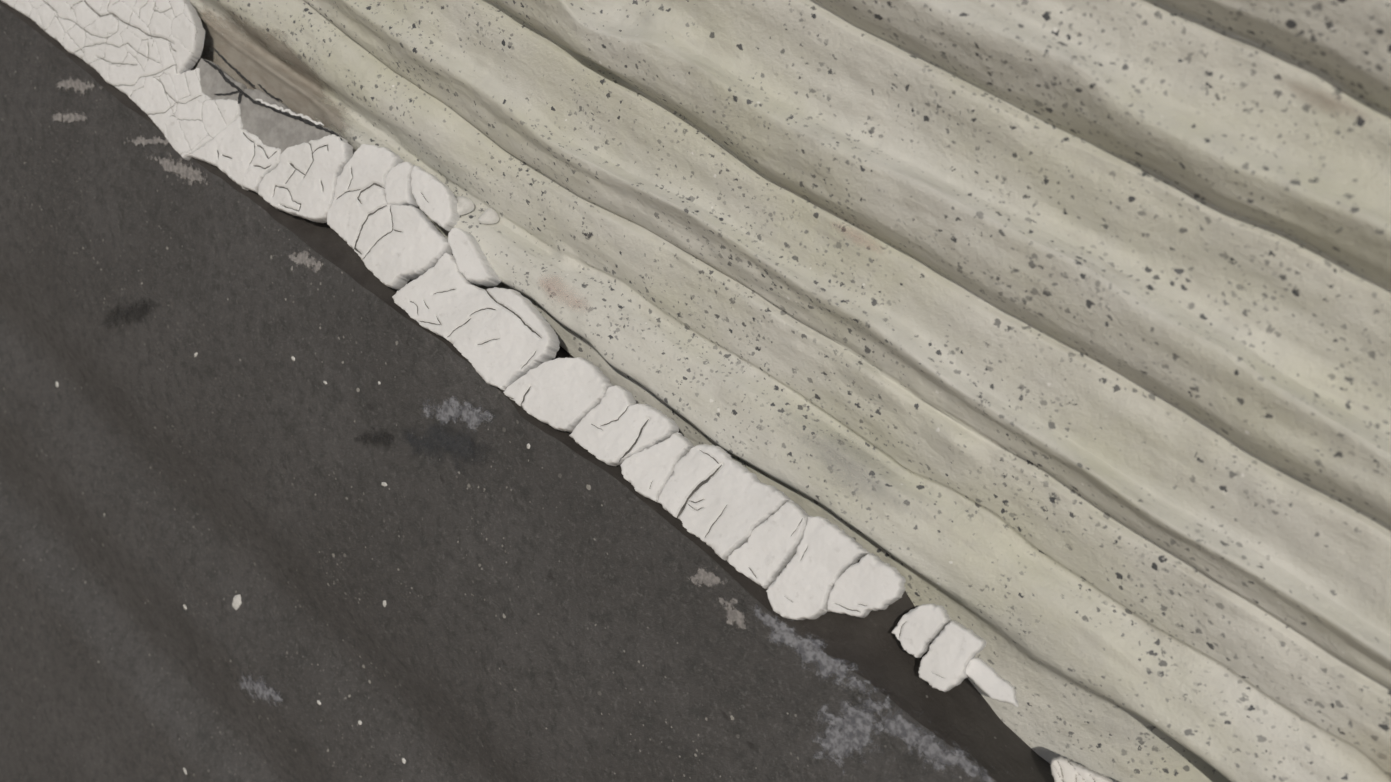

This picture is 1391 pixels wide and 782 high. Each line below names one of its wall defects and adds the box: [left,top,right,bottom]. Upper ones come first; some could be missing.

crack [3,0,401,259]
crack [410,289,542,409]
peeling [2,0,1019,707]
crack [592,406,649,462]
crack [677,450,727,537]